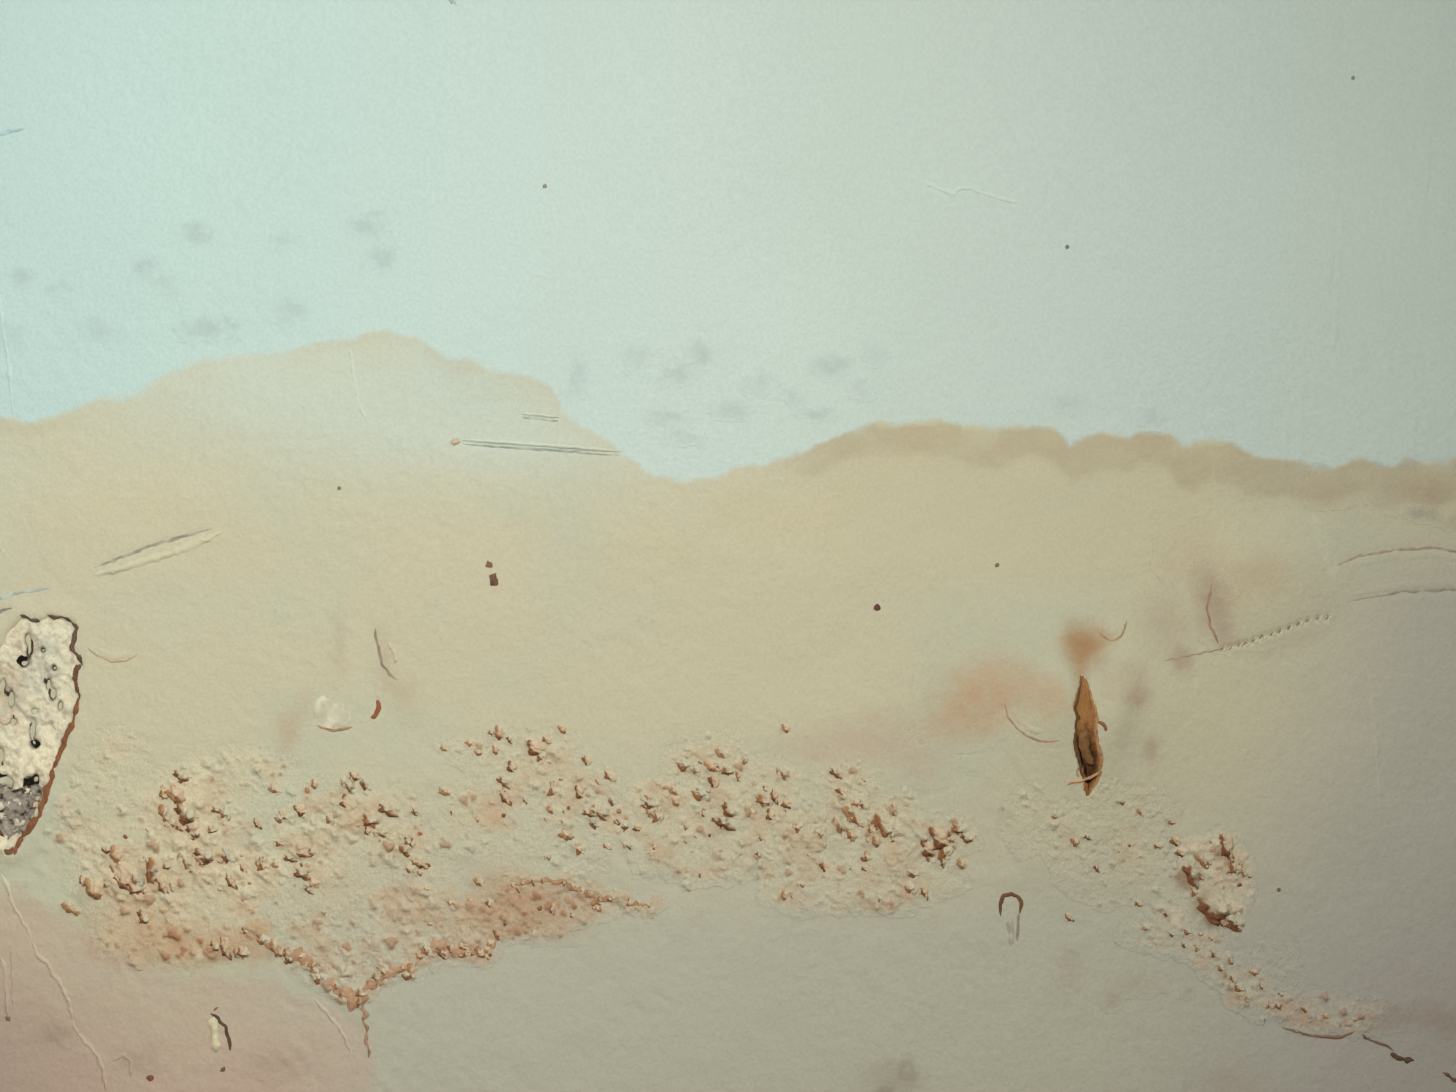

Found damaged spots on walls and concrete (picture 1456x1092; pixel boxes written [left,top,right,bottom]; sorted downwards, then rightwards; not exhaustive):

crack [0,128,25,136]
flaking render [0,614,1392,1058]
leakage [0,294,1456,1092]
rust [897,610,1119,755]